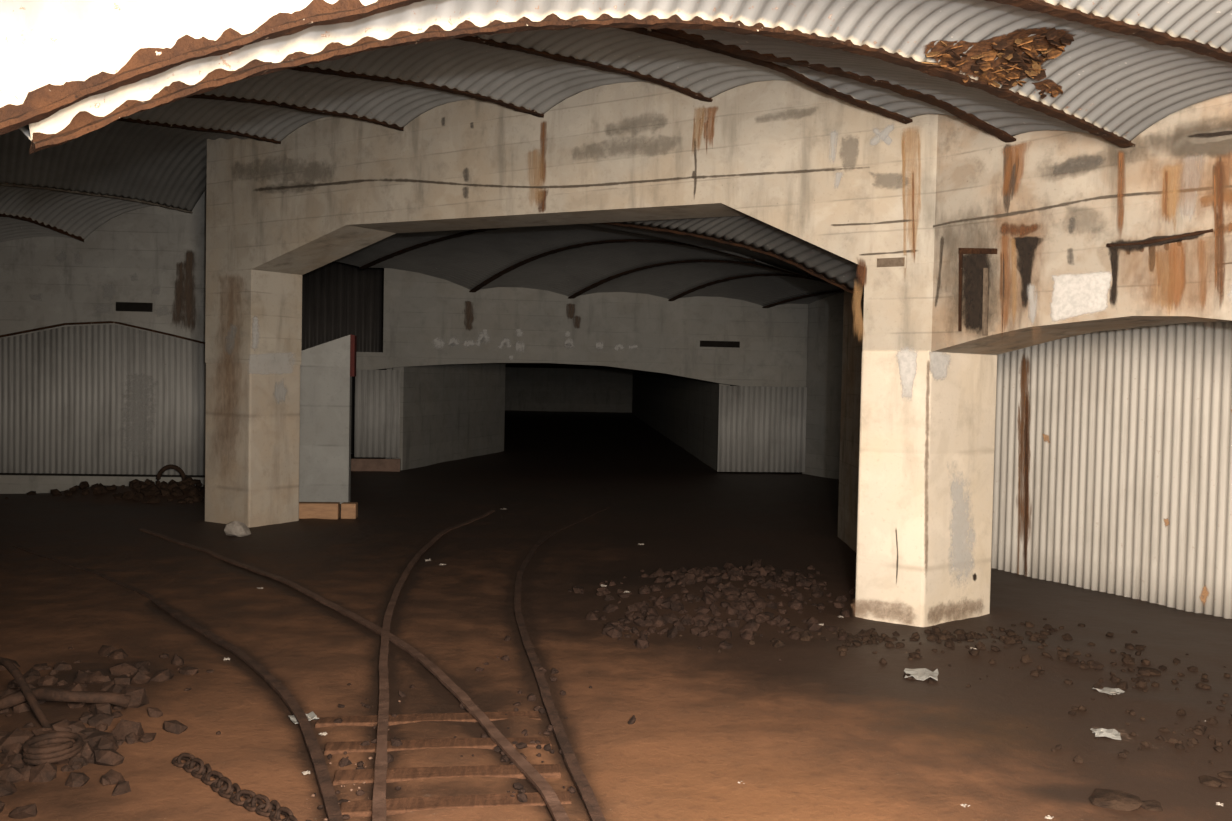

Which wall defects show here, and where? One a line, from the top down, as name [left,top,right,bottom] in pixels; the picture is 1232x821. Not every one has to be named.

corrosion [922,27,1076,99]
corrosion [533,122,546,212]
corrosion [692,107,716,150]
corrosion [903,170,920,257]
corrosion [1000,144,1041,330]
corrosion [1156,152,1232,306]
corrosion [172,251,196,328]
corrosion [1018,356,1050,575]